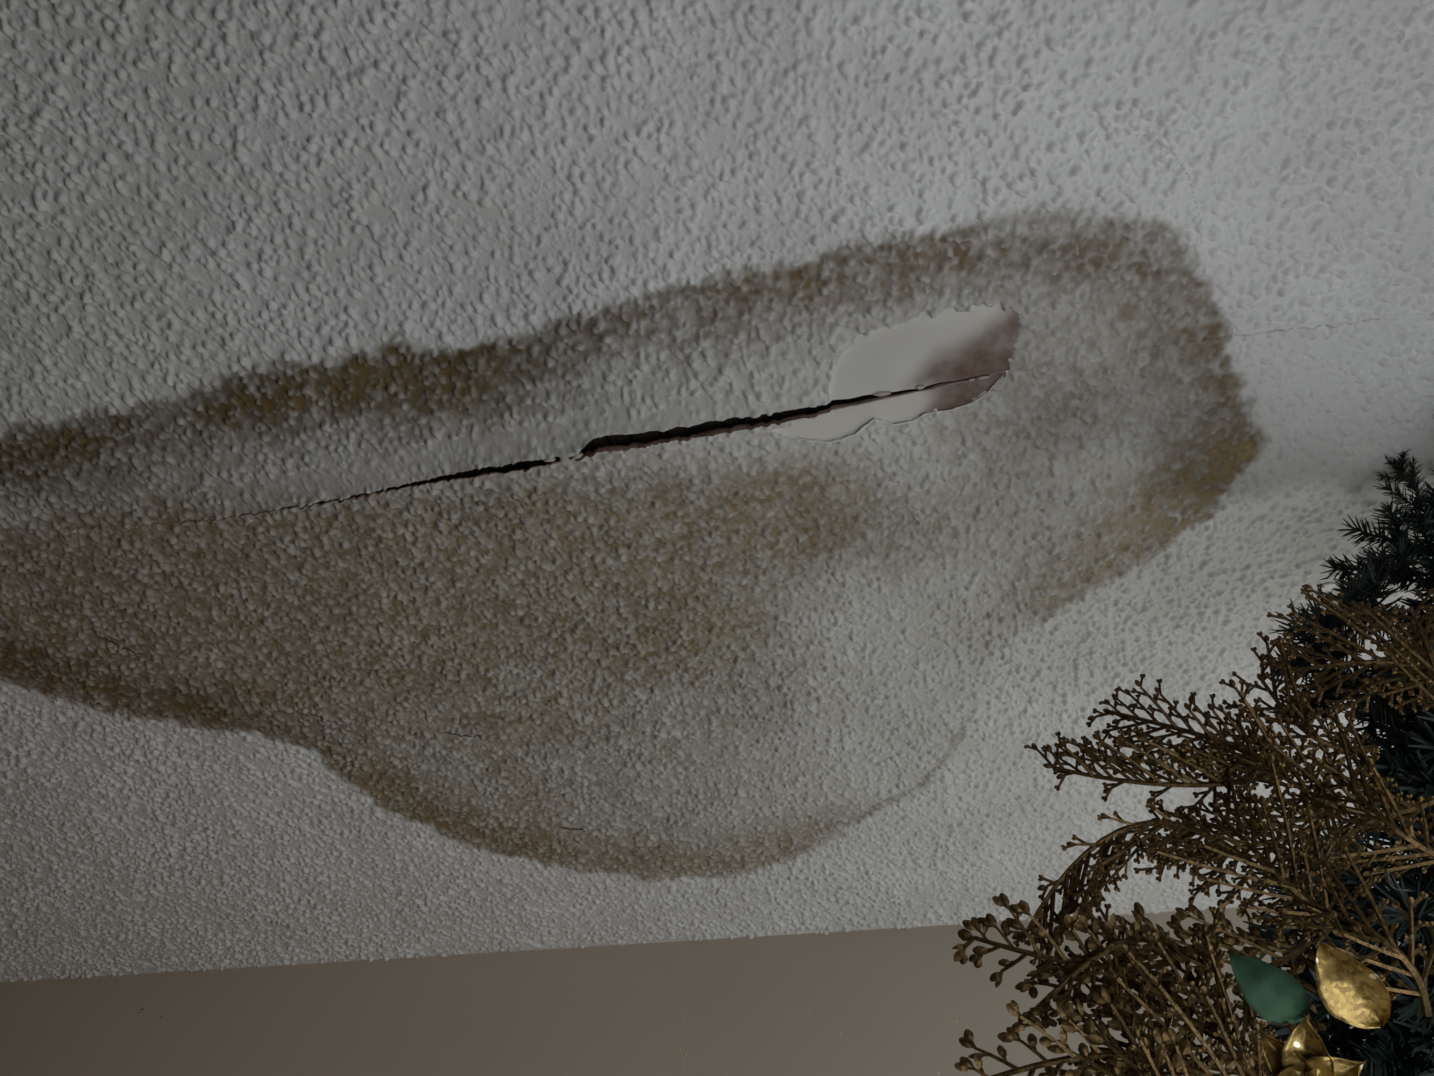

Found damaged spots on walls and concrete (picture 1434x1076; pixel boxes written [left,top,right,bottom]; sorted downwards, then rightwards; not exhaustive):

water stain [699,225,1161,325]
water stain [0,343,540,491]
crack [7,374,990,532]
peeling [769,302,1020,444]
water stain [1079,435,1256,581]
water stain [1182,312,1233,407]
water stain [0,469,881,864]